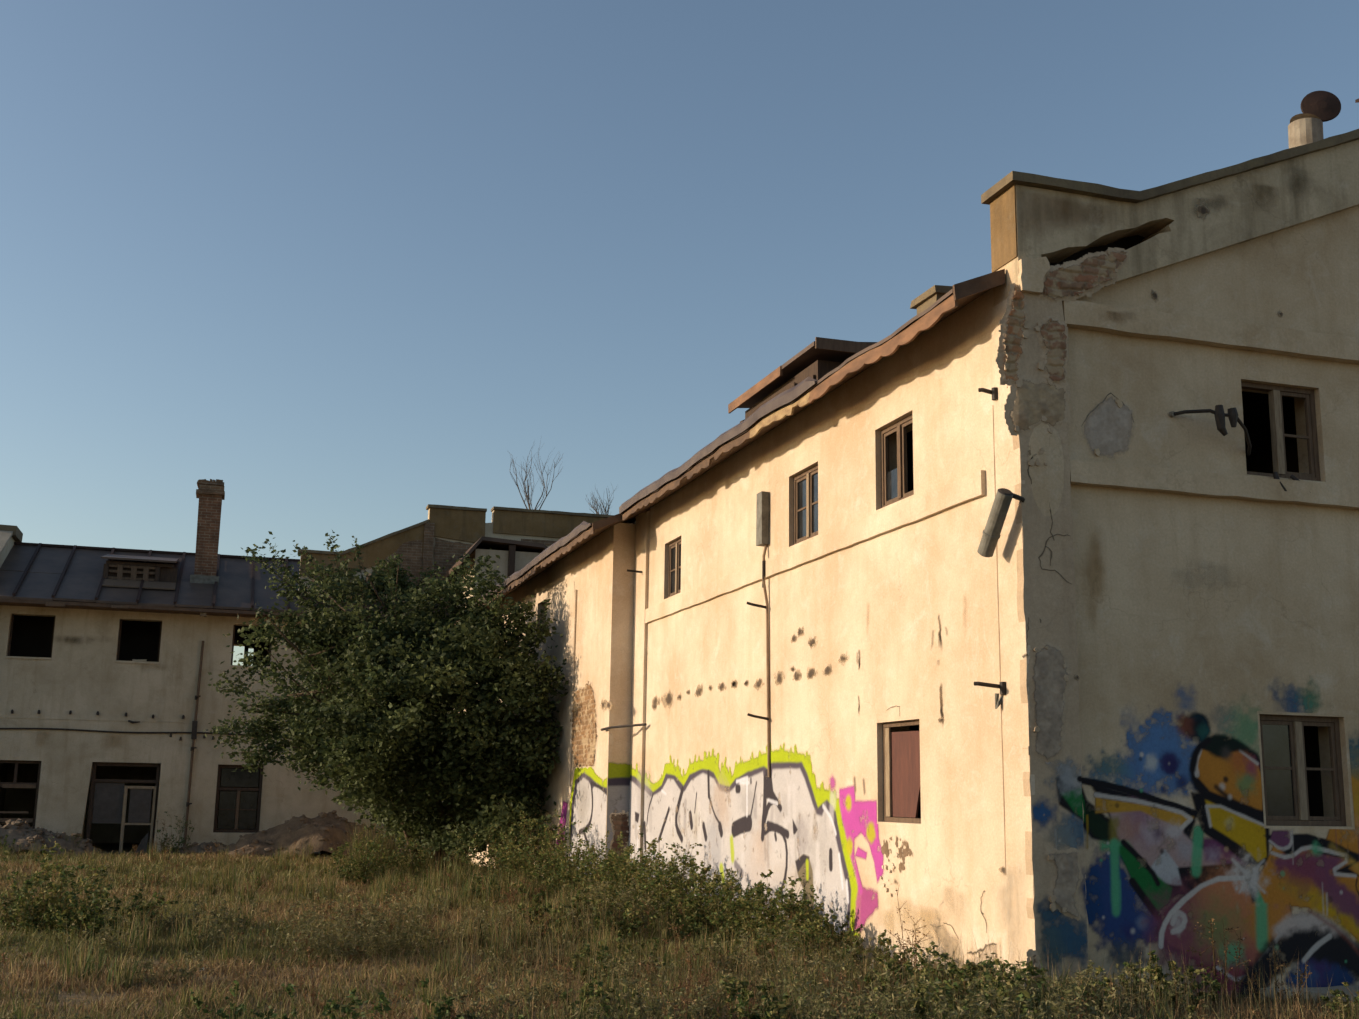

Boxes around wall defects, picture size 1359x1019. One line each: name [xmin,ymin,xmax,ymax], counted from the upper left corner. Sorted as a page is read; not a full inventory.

flaking render [996,247,1129,438]
crack [1027,454,1071,584]
flaking render [570,681,612,769]
spalling [652,654,847,710]
spalling [791,627,816,648]
flaking render [1026,638,1079,765]